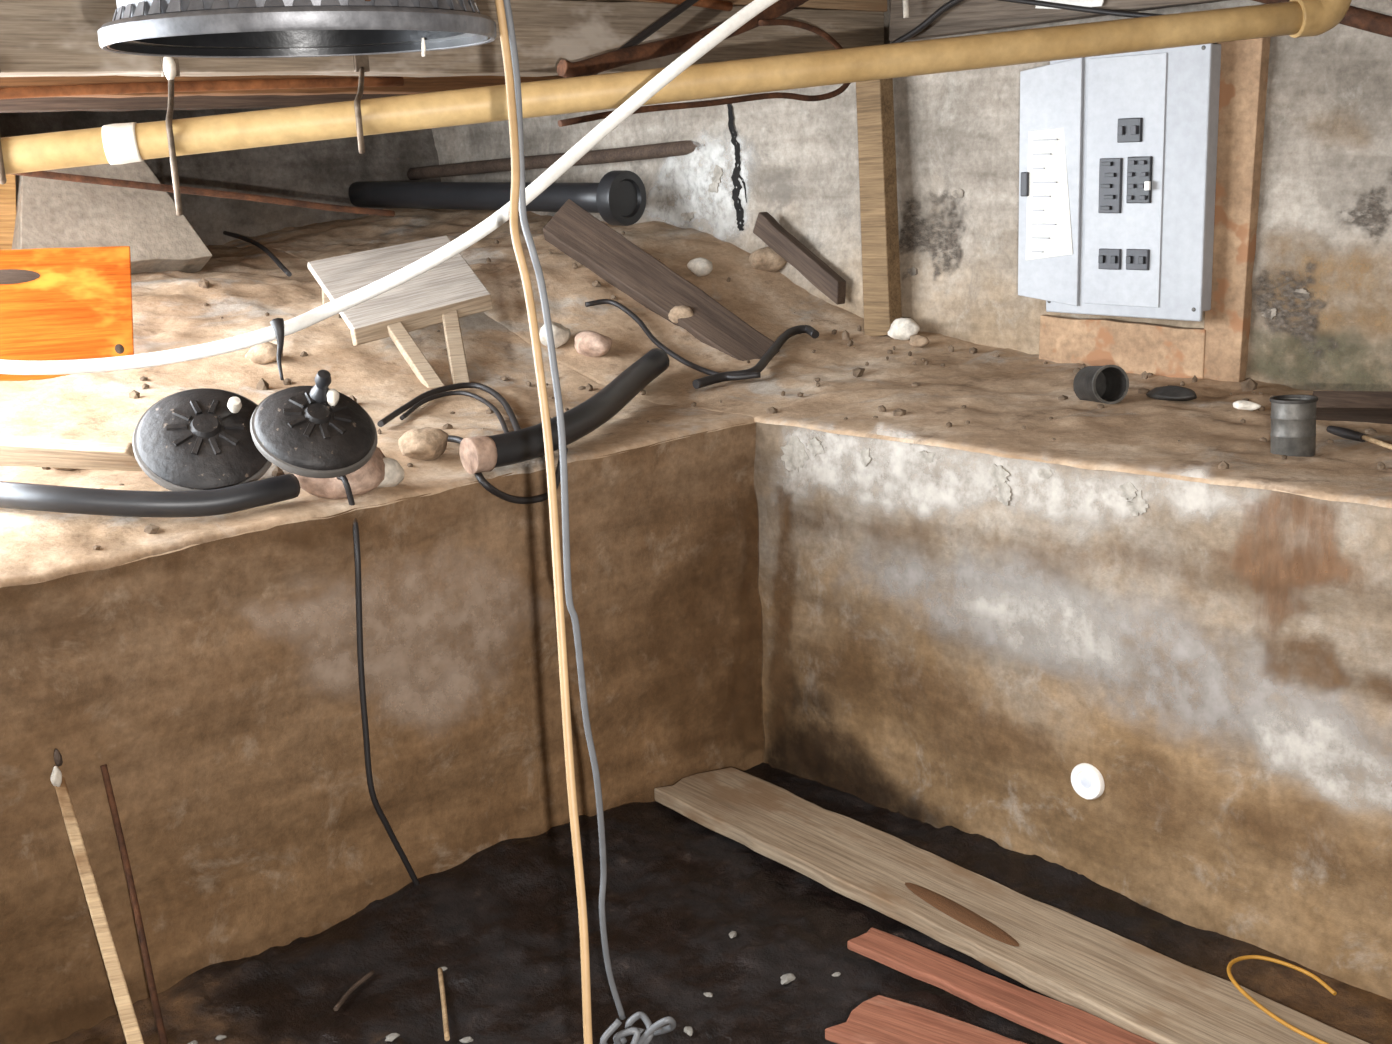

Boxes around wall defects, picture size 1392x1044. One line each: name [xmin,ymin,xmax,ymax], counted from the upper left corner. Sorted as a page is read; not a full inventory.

crack [727,104,747,231]
water stain [883,561,1392,806]